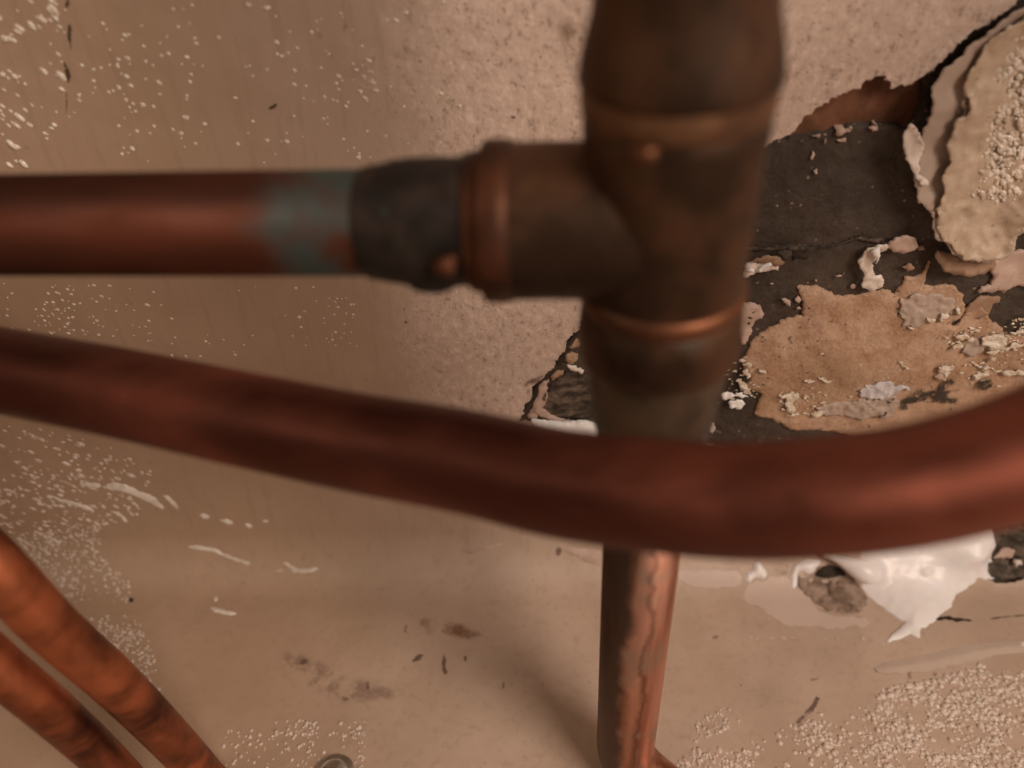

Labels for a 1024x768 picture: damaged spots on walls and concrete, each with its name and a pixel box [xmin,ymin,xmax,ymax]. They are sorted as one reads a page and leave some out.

flaking render [706,0,1024,442]
flaking render [516,317,593,422]
flaking render [797,565,867,614]
flaking render [987,526,1024,588]